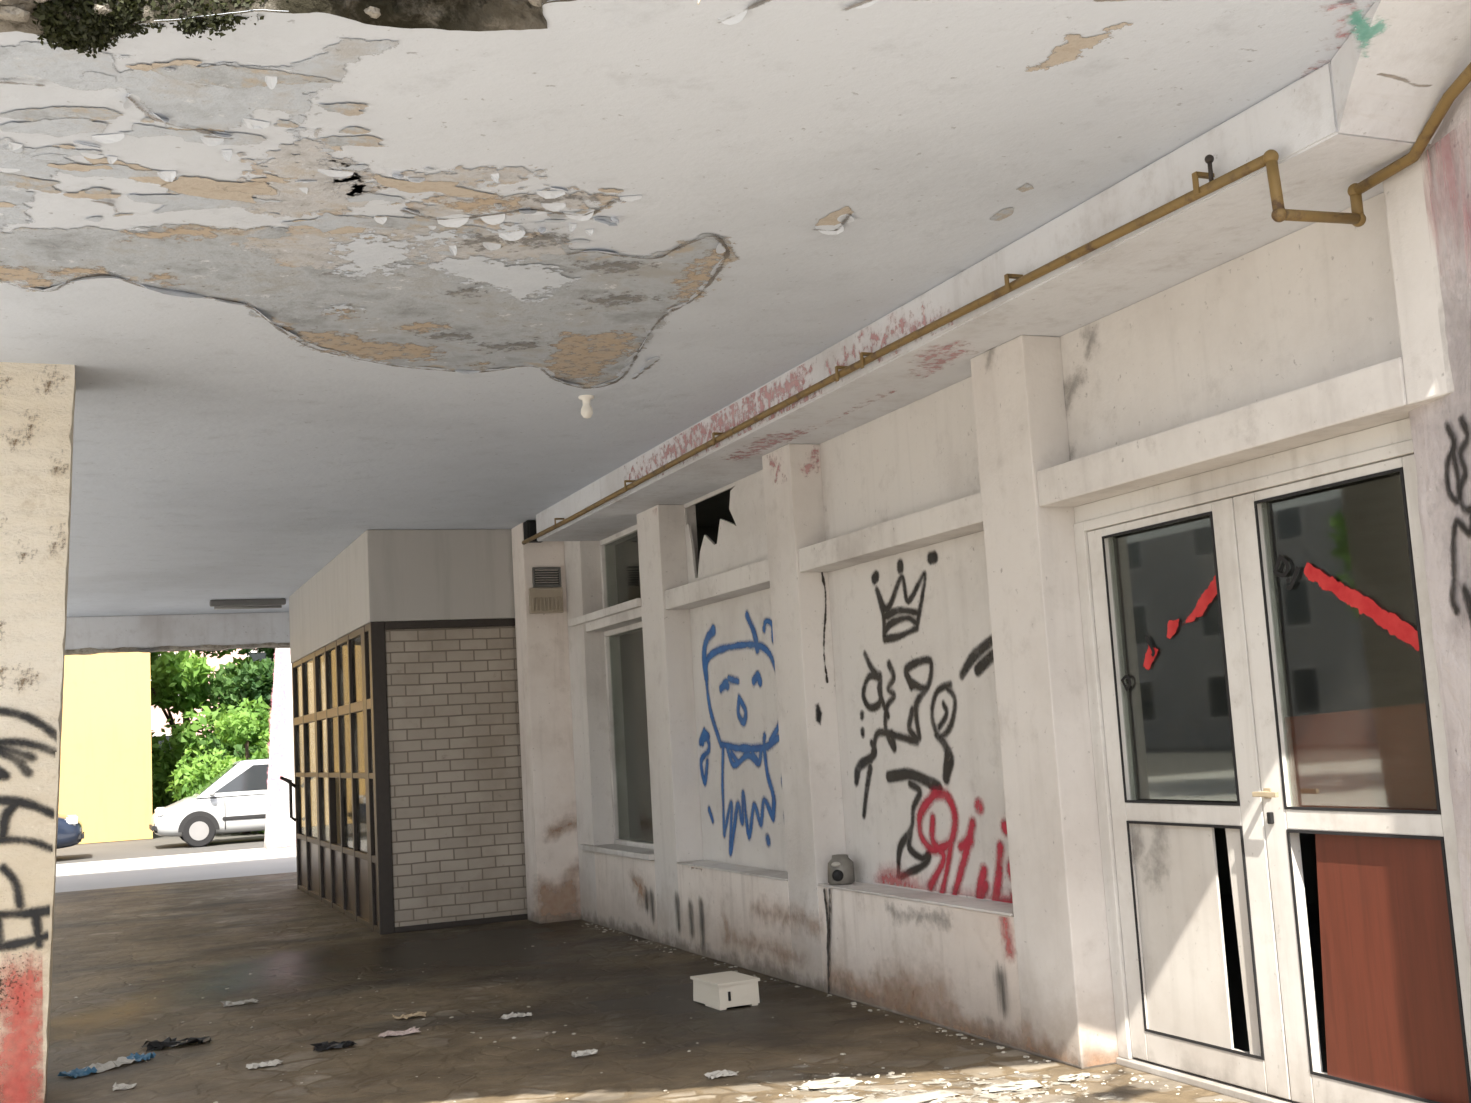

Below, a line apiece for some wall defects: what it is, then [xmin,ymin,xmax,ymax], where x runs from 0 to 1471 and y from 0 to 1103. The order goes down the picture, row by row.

peeling [1027,22,1132,72]
peeling [0,0,740,389]
peeling [815,206,855,235]
water stain [676,897,704,946]
crack [823,888,831,994]